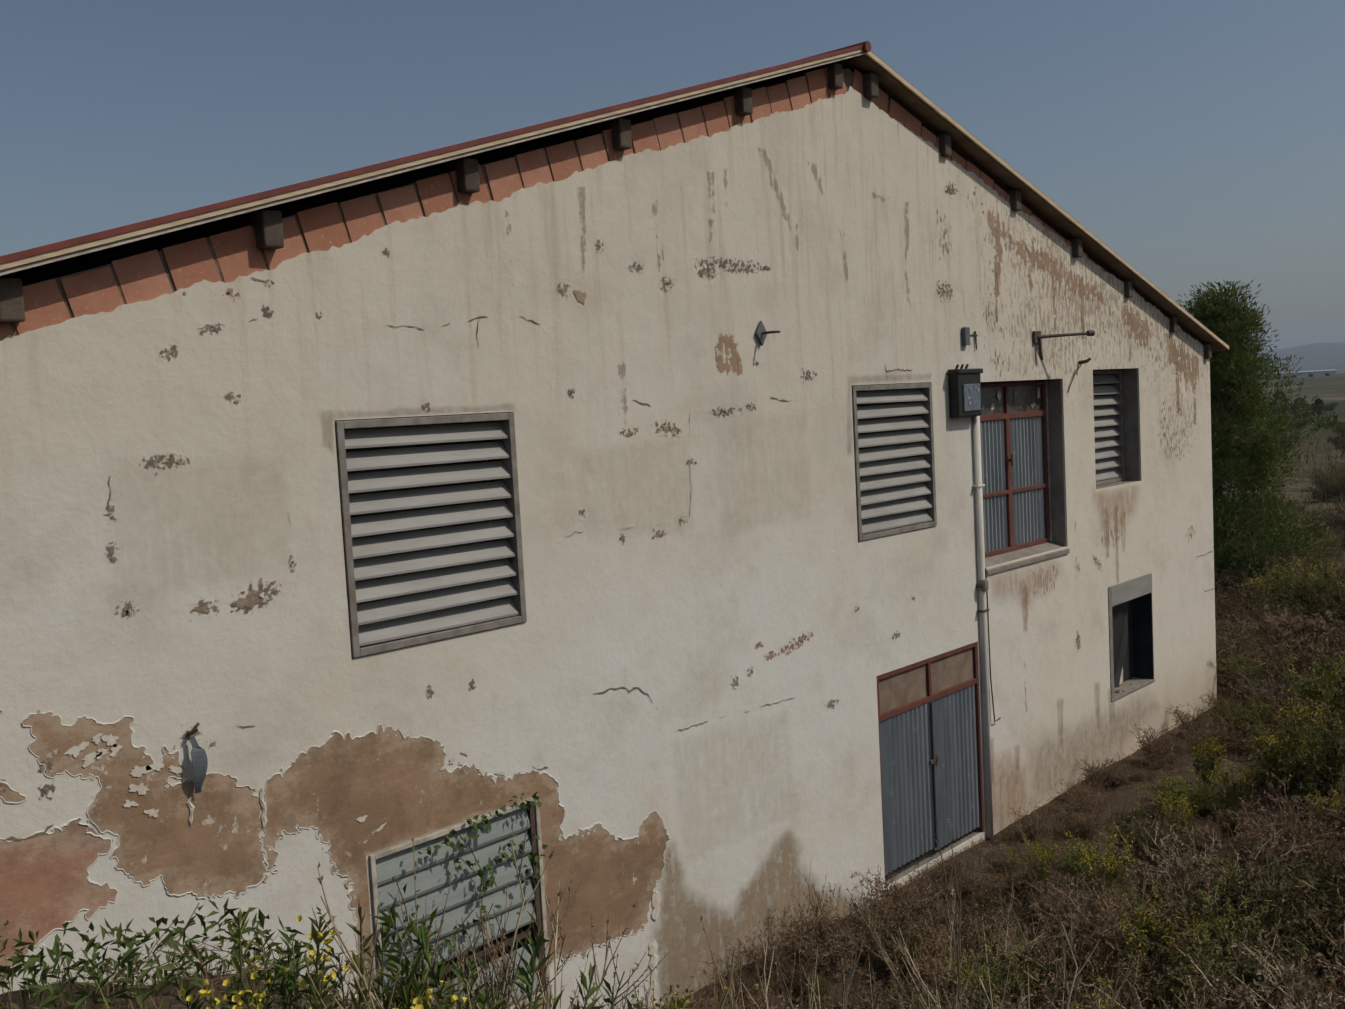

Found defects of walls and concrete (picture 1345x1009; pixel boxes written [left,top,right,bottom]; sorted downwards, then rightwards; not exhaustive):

flaking render [695,256,770,280]
crack [388,316,486,344]
damp [982,210,1199,425]
flaking render [160,345,178,361]
flaking render [139,453,190,476]
flaking render [190,578,281,621]
flaking render [756,633,813,660]
crack [594,687,796,731]
flaking render [0,709,671,1009]
damp [659,837,850,1008]